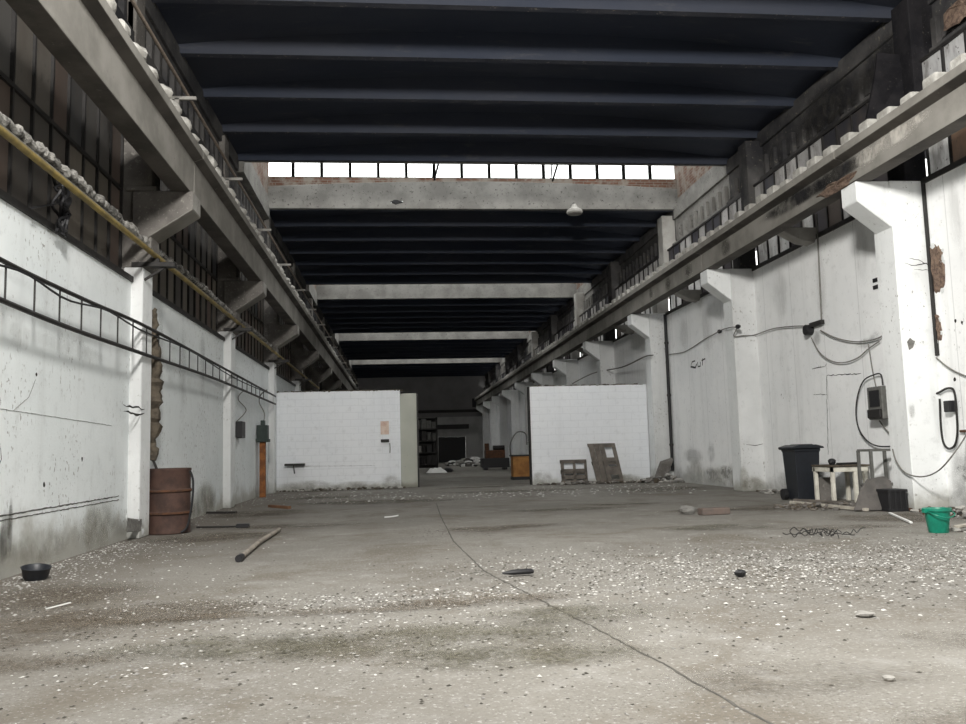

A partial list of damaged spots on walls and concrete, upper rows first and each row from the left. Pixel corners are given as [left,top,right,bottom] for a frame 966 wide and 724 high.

spalling [943,0,966,31]
spalling [930,243,945,294]